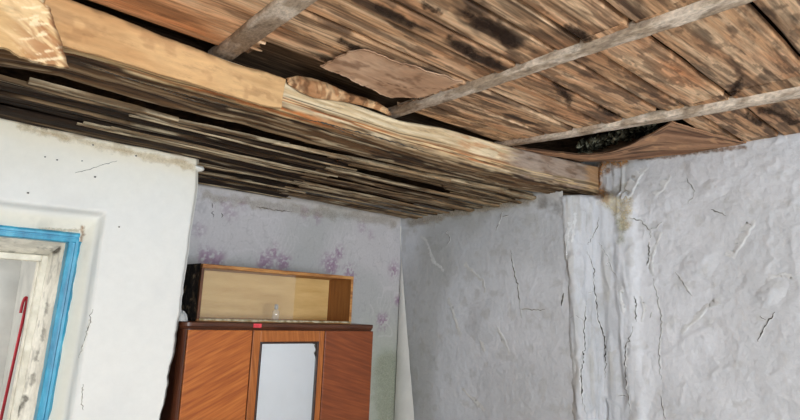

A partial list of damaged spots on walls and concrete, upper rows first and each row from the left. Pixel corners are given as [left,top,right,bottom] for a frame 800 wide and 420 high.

damp [464,10,516,49]
crack [79,310,93,355]
crack [511,218,666,419]
crack [757,312,775,341]